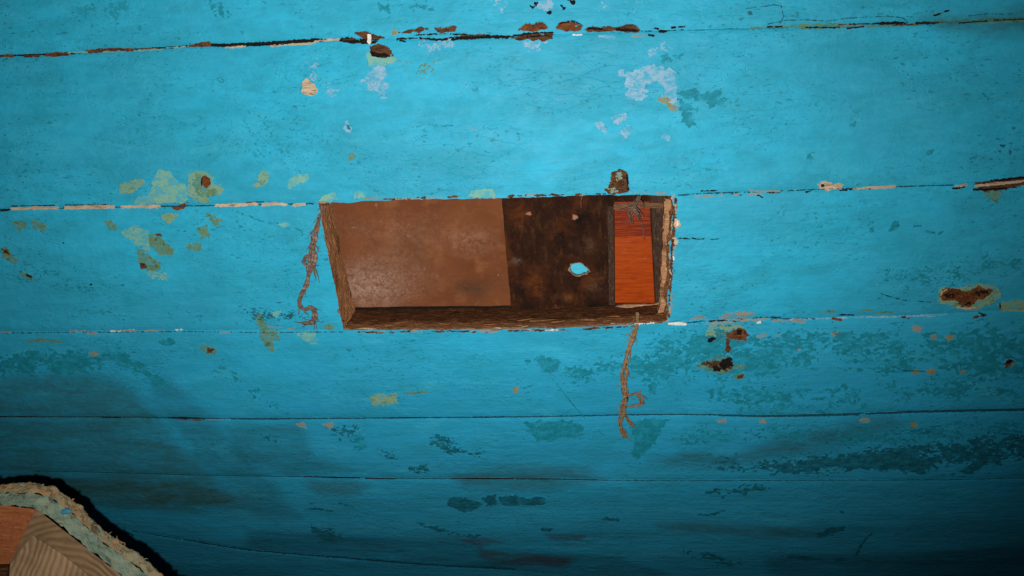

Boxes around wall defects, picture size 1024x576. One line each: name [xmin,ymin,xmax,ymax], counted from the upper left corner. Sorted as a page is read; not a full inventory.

peeling [301,53,344,100]
peeling [595,41,728,138]
peeling [112,111,334,189]
peeling [104,169,224,281]
peeling [143,302,335,352]
peeling [523,172,1024,517]
peeling [369,390,429,407]